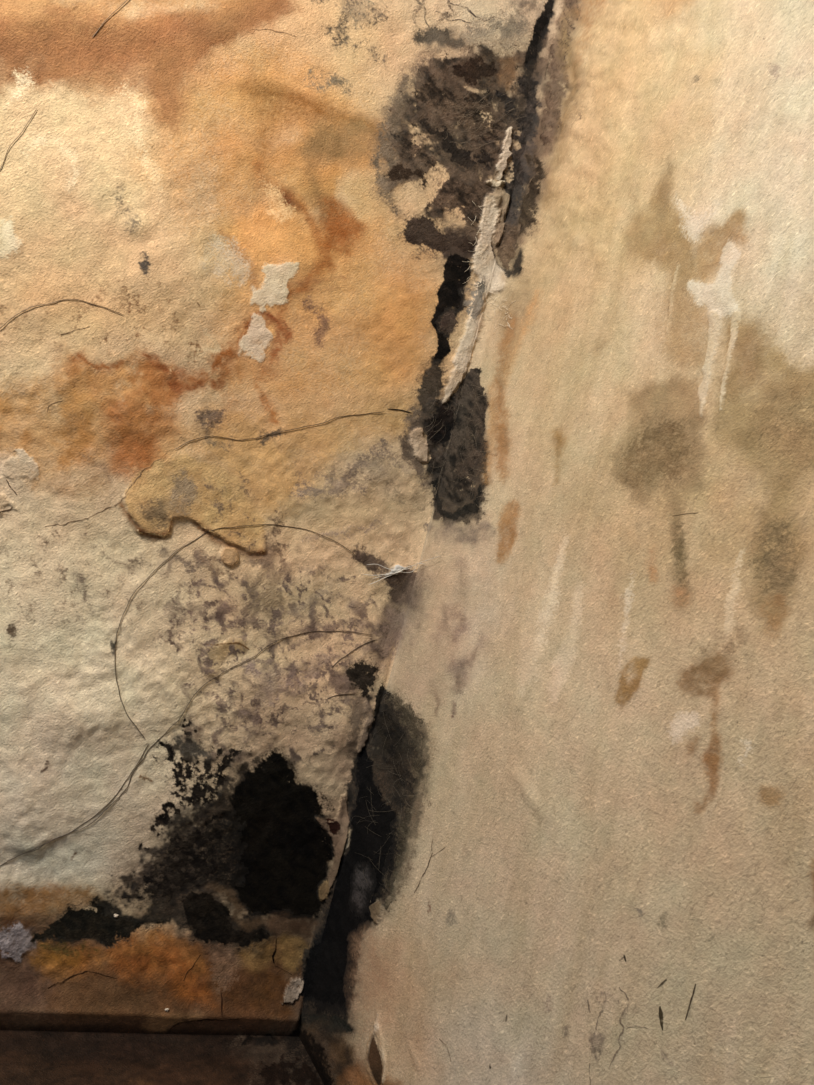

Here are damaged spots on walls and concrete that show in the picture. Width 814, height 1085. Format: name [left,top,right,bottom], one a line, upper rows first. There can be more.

rust [0,0,308,137]
crack [61,326,90,336]
rust [0,190,369,487]
flaking render [189,222,302,365]
peeling [0,446,42,519]
water stain [0,0,596,1045]
water stain [605,151,814,678]
rust [0,876,95,924]
crack [414,839,447,893]
rust [26,934,294,1034]
rust [322,921,409,1085]